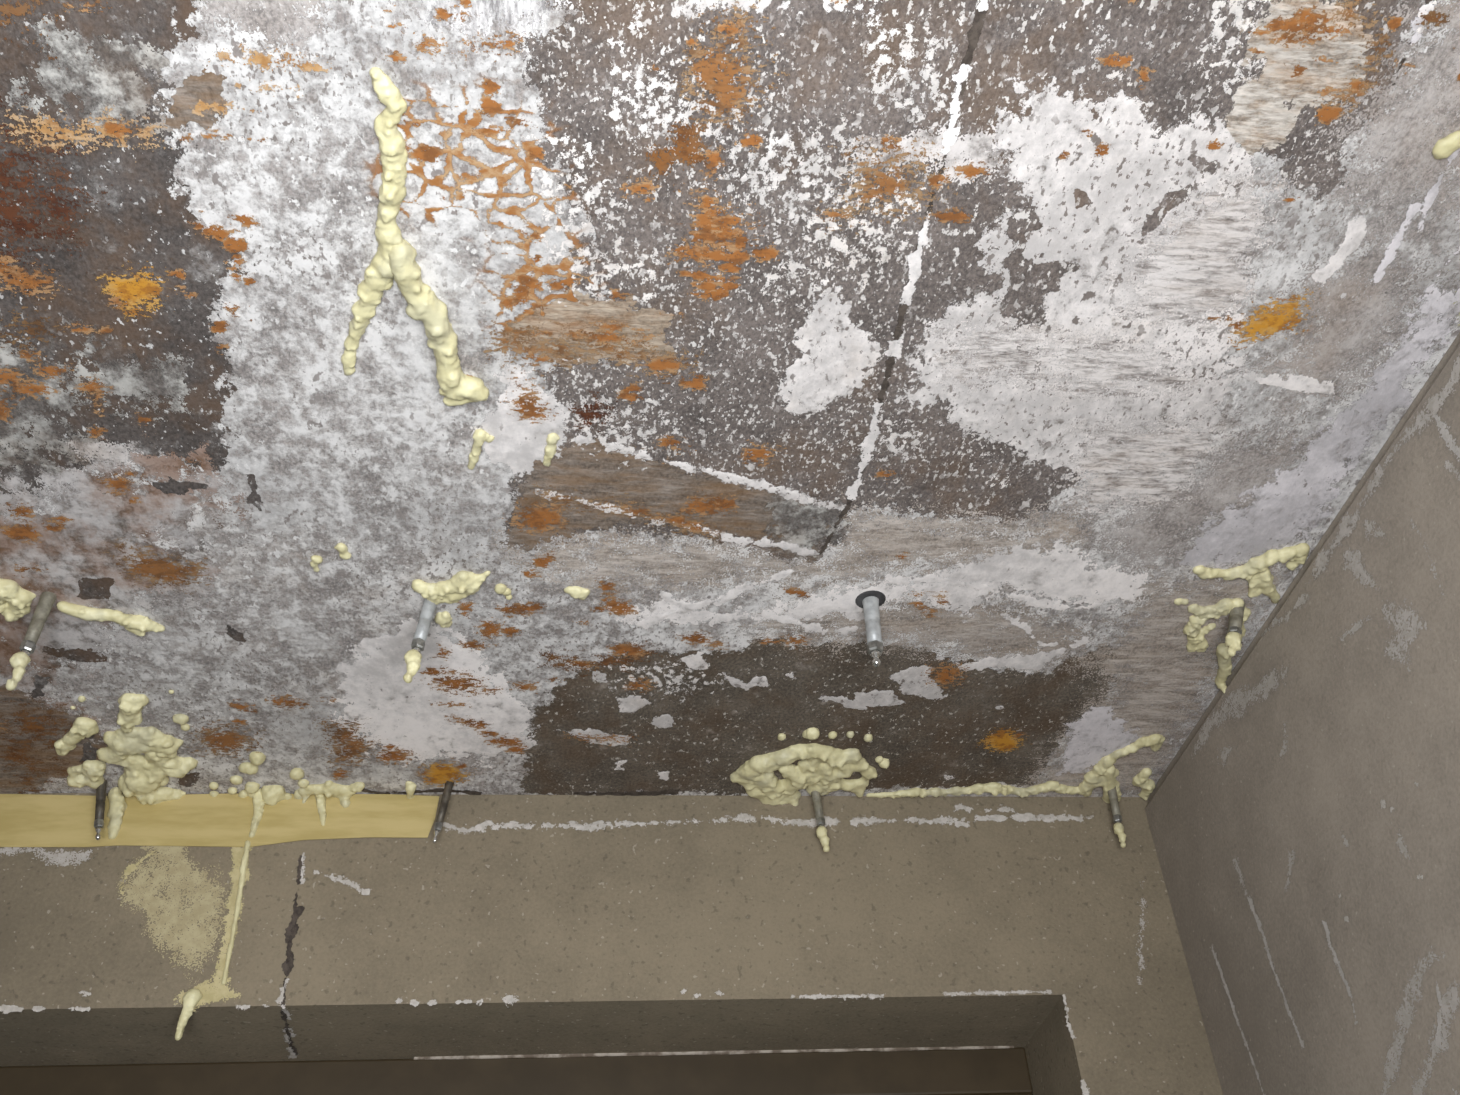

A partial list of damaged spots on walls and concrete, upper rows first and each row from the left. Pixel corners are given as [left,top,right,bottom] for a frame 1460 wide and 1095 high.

corrosion [0,43,332,440]
corrosion [380,0,524,64]
corrosion [397,78,712,432]
corrosion [612,0,790,318]
spalling [328,0,1460,797]
crack [819,0,989,554]
corrosion [1208,287,1321,350]
corrosion [1248,0,1450,129]
corrosion [502,482,739,578]
water stain [1343,547,1386,592]
water stain [904,803,1094,828]
crack [275,852,306,1059]